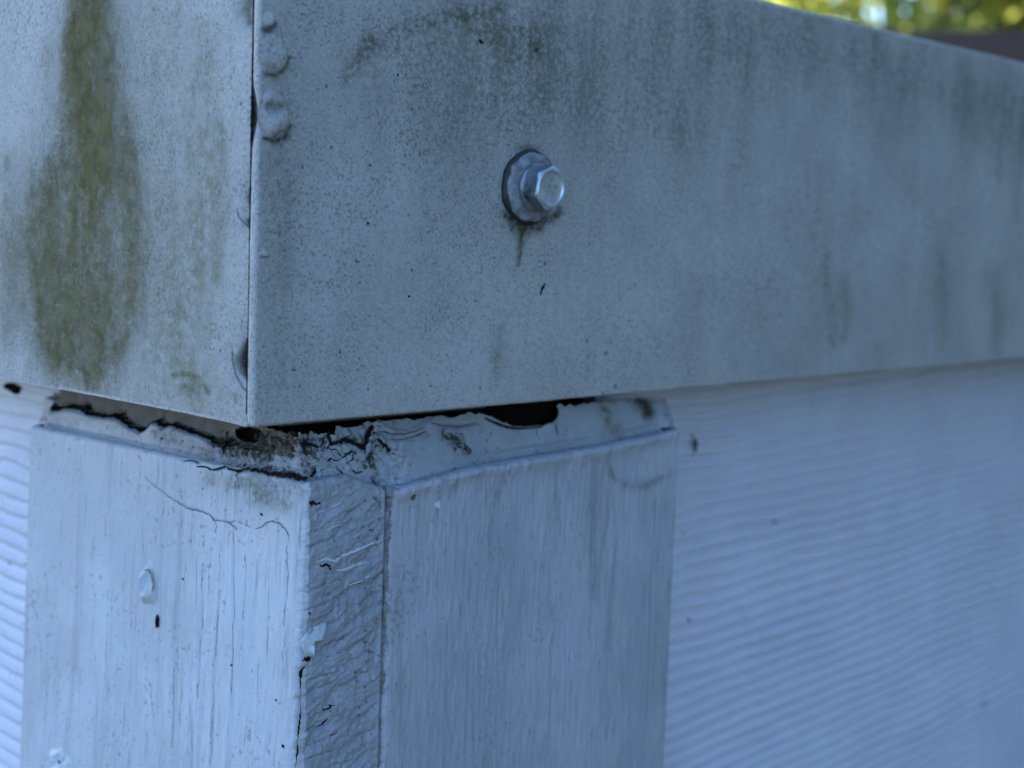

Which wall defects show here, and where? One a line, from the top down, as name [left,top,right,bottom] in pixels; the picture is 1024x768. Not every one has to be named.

crack [143,476,307,765]